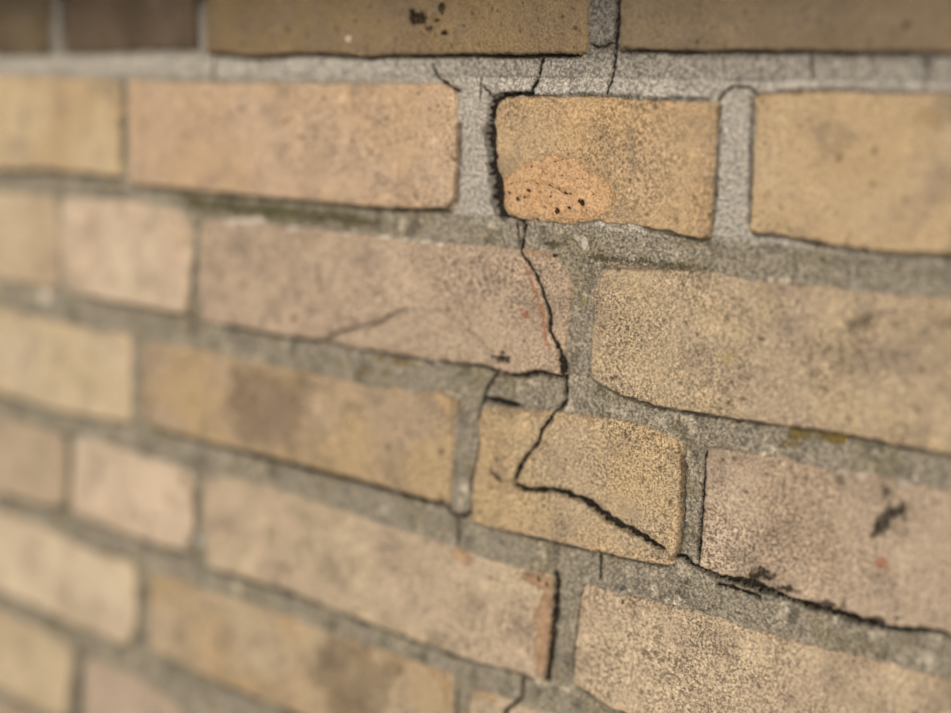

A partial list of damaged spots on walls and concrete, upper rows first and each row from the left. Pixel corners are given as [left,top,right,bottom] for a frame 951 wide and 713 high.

crack [592,0,621,95]
crack [432,64,495,102]
crack [531,57,546,93]
crack [718,86,758,101]
spalling [503,151,614,222]
crack [326,308,406,340]
crack [439,215,951,636]
crack [504,672,525,713]